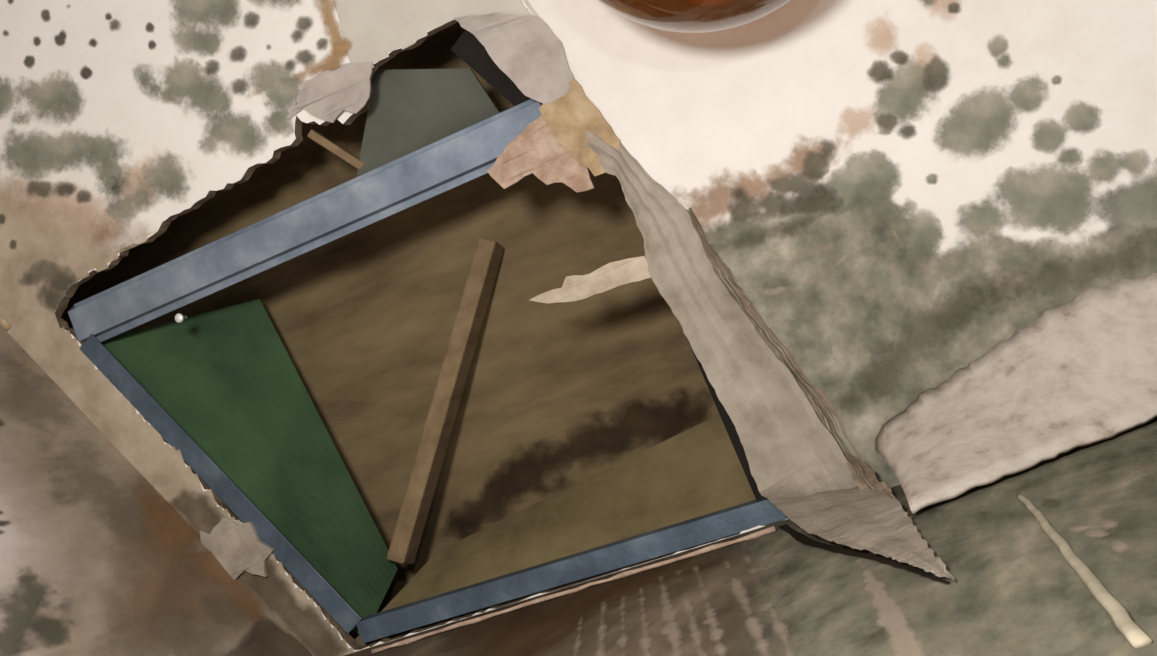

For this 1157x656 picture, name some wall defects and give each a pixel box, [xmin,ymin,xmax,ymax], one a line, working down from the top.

mould [24,37,40,67]
mould [55,32,66,46]
damp [0,67,185,219]
damp [137,0,350,154]
mould [869,52,948,137]
mould [989,37,1010,67]
mould [938,76,1061,155]
mould [1033,103,1098,152]
damp [0,142,1157,656]